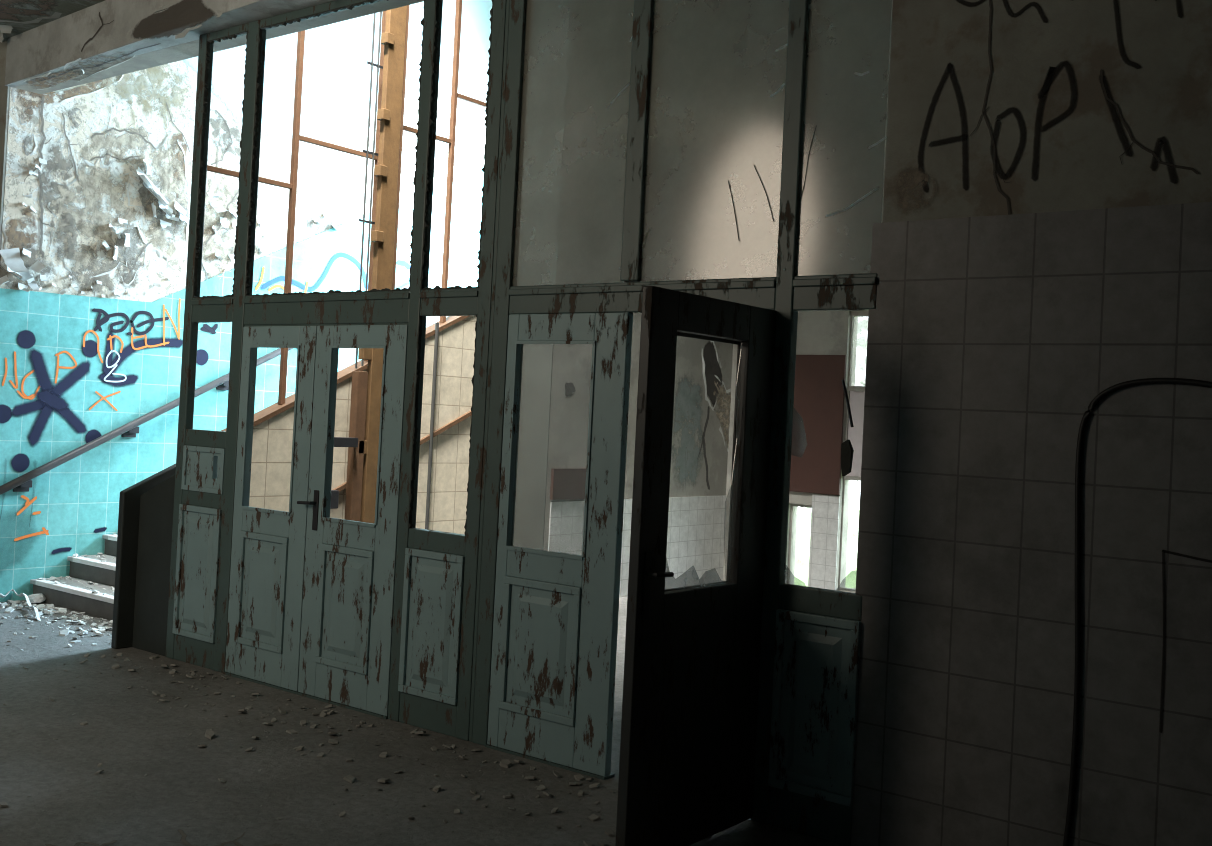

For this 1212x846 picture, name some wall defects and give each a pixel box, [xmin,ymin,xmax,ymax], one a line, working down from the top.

spalling [0,0,222,298]
spalling [202,168,239,280]